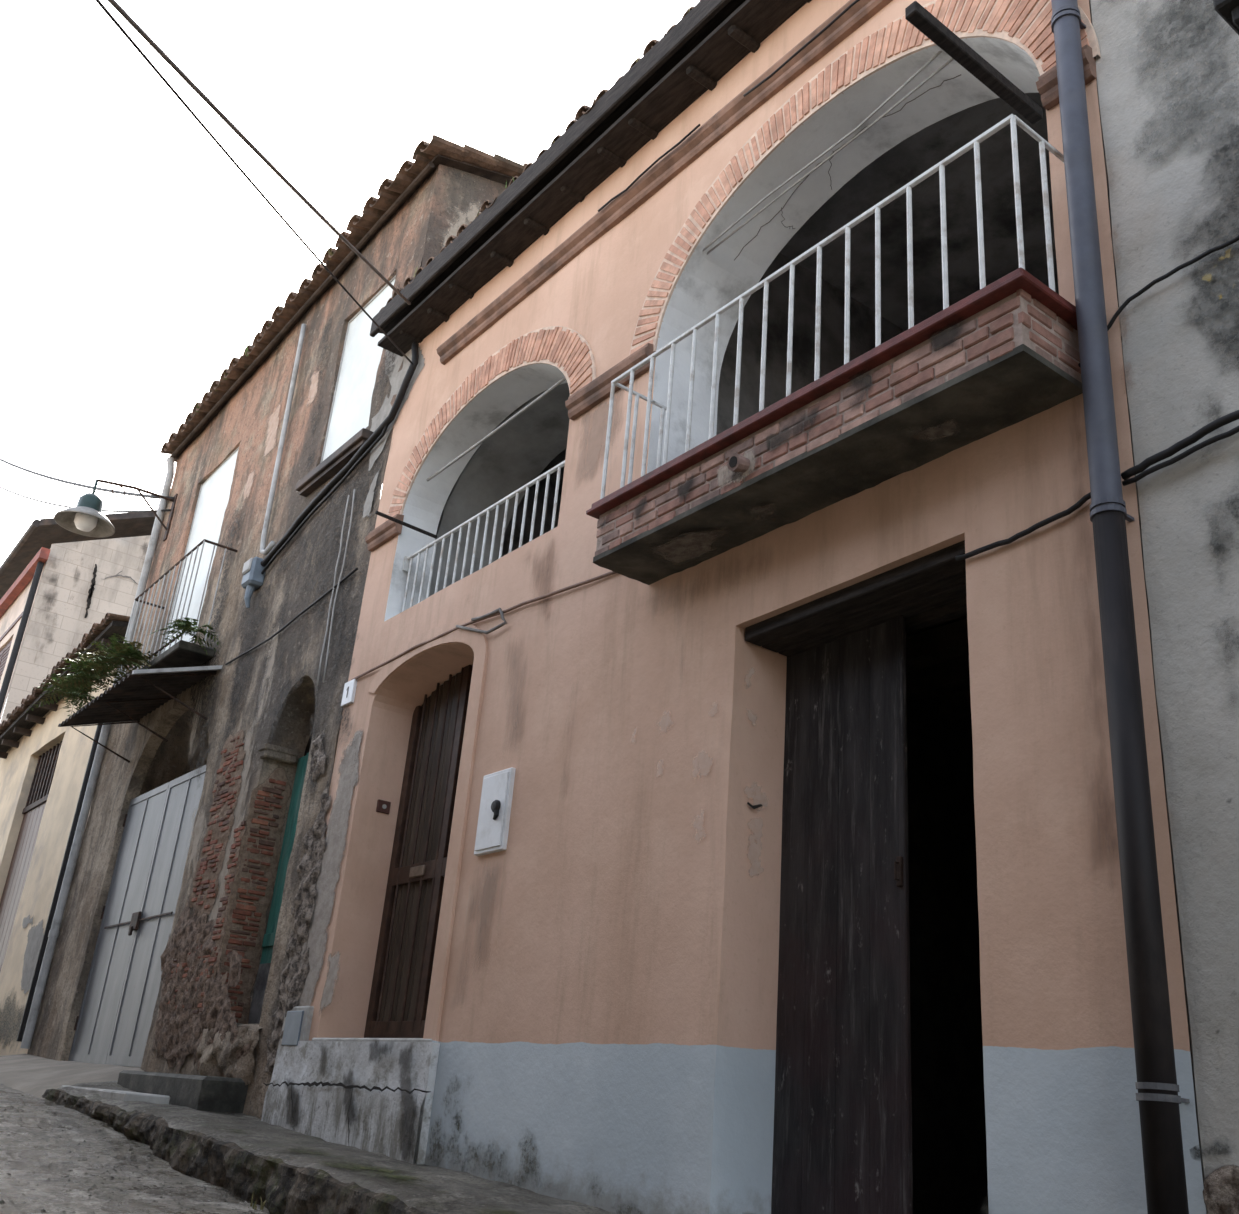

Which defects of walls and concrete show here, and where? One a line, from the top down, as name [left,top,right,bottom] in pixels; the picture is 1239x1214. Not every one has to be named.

water stain [444,205,481,247]
water stain [1140,0,1239,366]
crack [84,564,138,618]
water stain [189,511,239,778]
water stain [277,443,388,737]
water stain [209,585,307,931]
flaking render [152,728,363,1074]
water stain [285,1079,299,1127]
crack [263,1081,431,1143]
water stain [343,1072,355,1123]
water stain [369,1040,416,1161]
water stain [430,1080,504,1177]